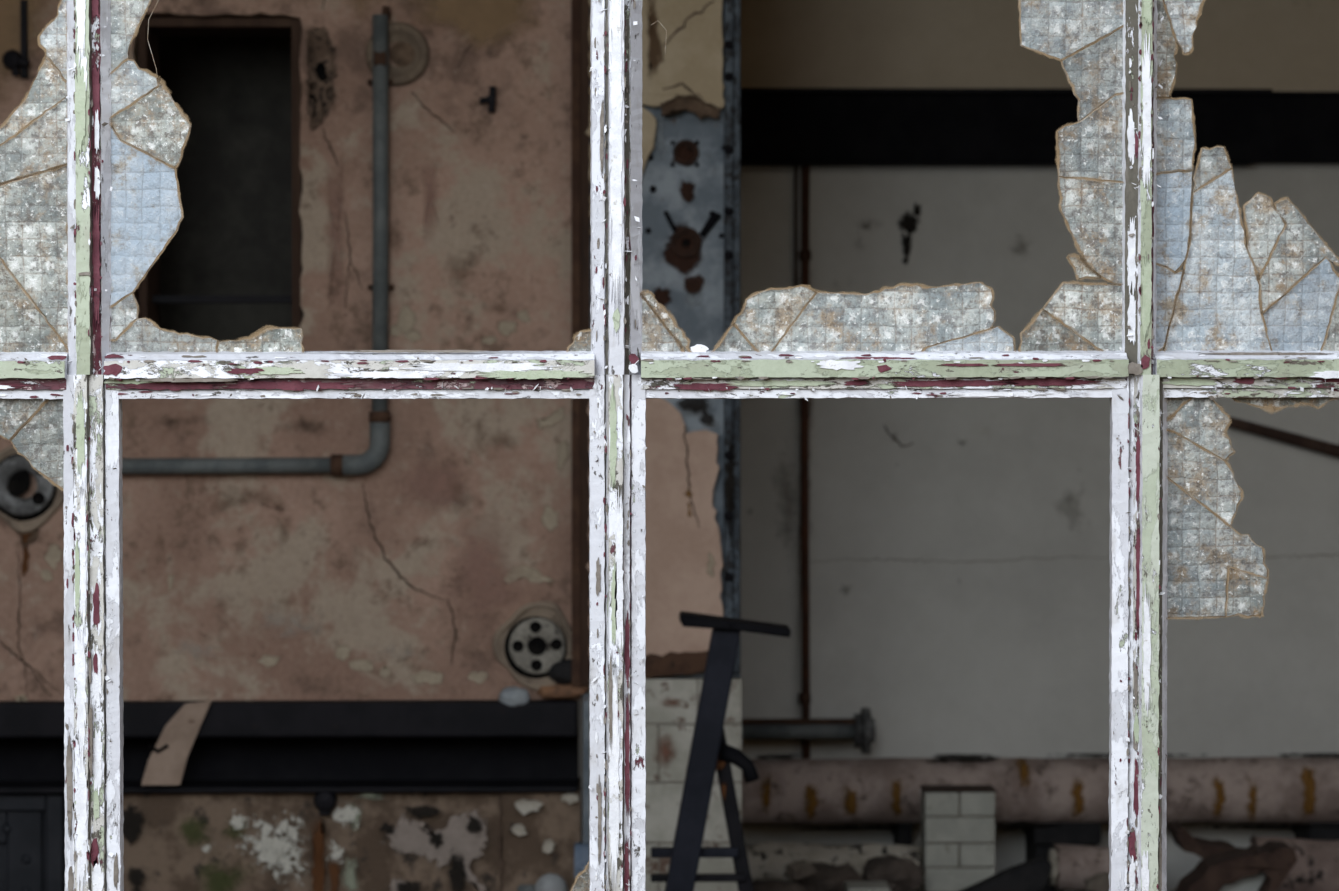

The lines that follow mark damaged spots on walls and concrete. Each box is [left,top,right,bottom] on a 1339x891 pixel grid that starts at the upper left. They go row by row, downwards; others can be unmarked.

peeling [660,0,1165,401]
crack [0,549,62,700]
peeling [93,350,647,891]
crack [363,484,457,665]